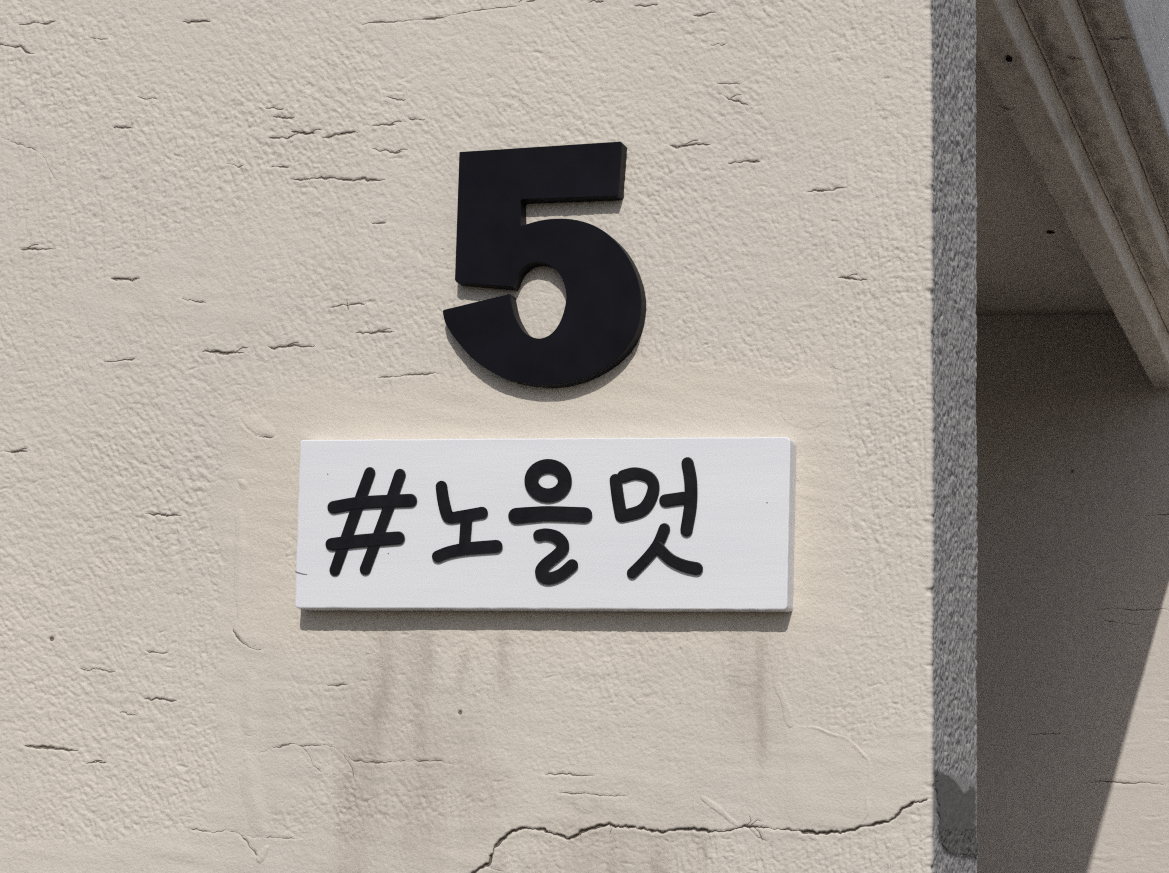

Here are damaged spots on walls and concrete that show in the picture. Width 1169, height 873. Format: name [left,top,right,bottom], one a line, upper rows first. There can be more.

crack [362,0,535,25]
crack [0,21,54,54]
crack [269,96,425,181]
crack [203,342,315,354]
crack [24,745,106,764]
crack [471,773,927,873]
crack [192,828,292,855]